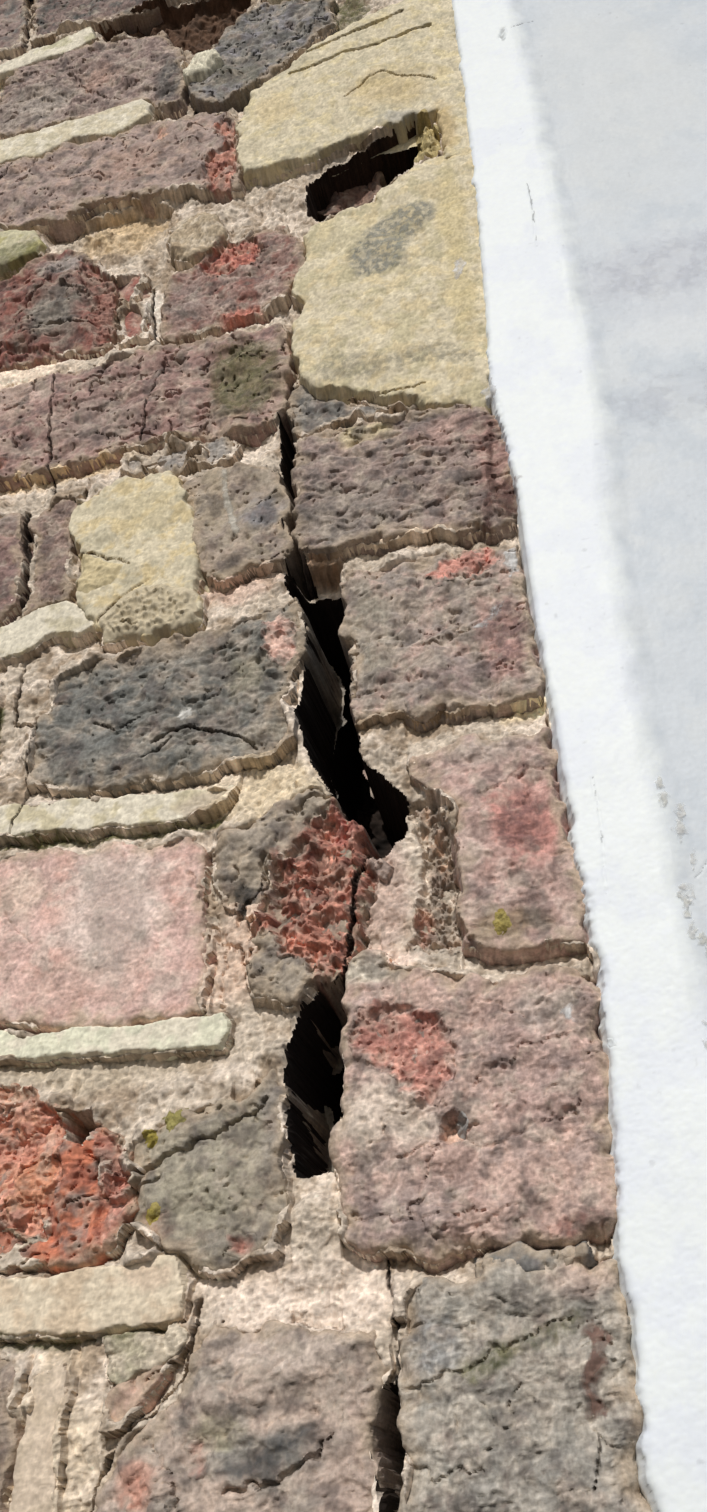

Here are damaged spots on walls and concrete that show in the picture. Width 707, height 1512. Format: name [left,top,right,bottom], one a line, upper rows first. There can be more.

crack [277,382,409,1178]
crack [380,1261,400,1397]
crack [369,1451,401,1512]